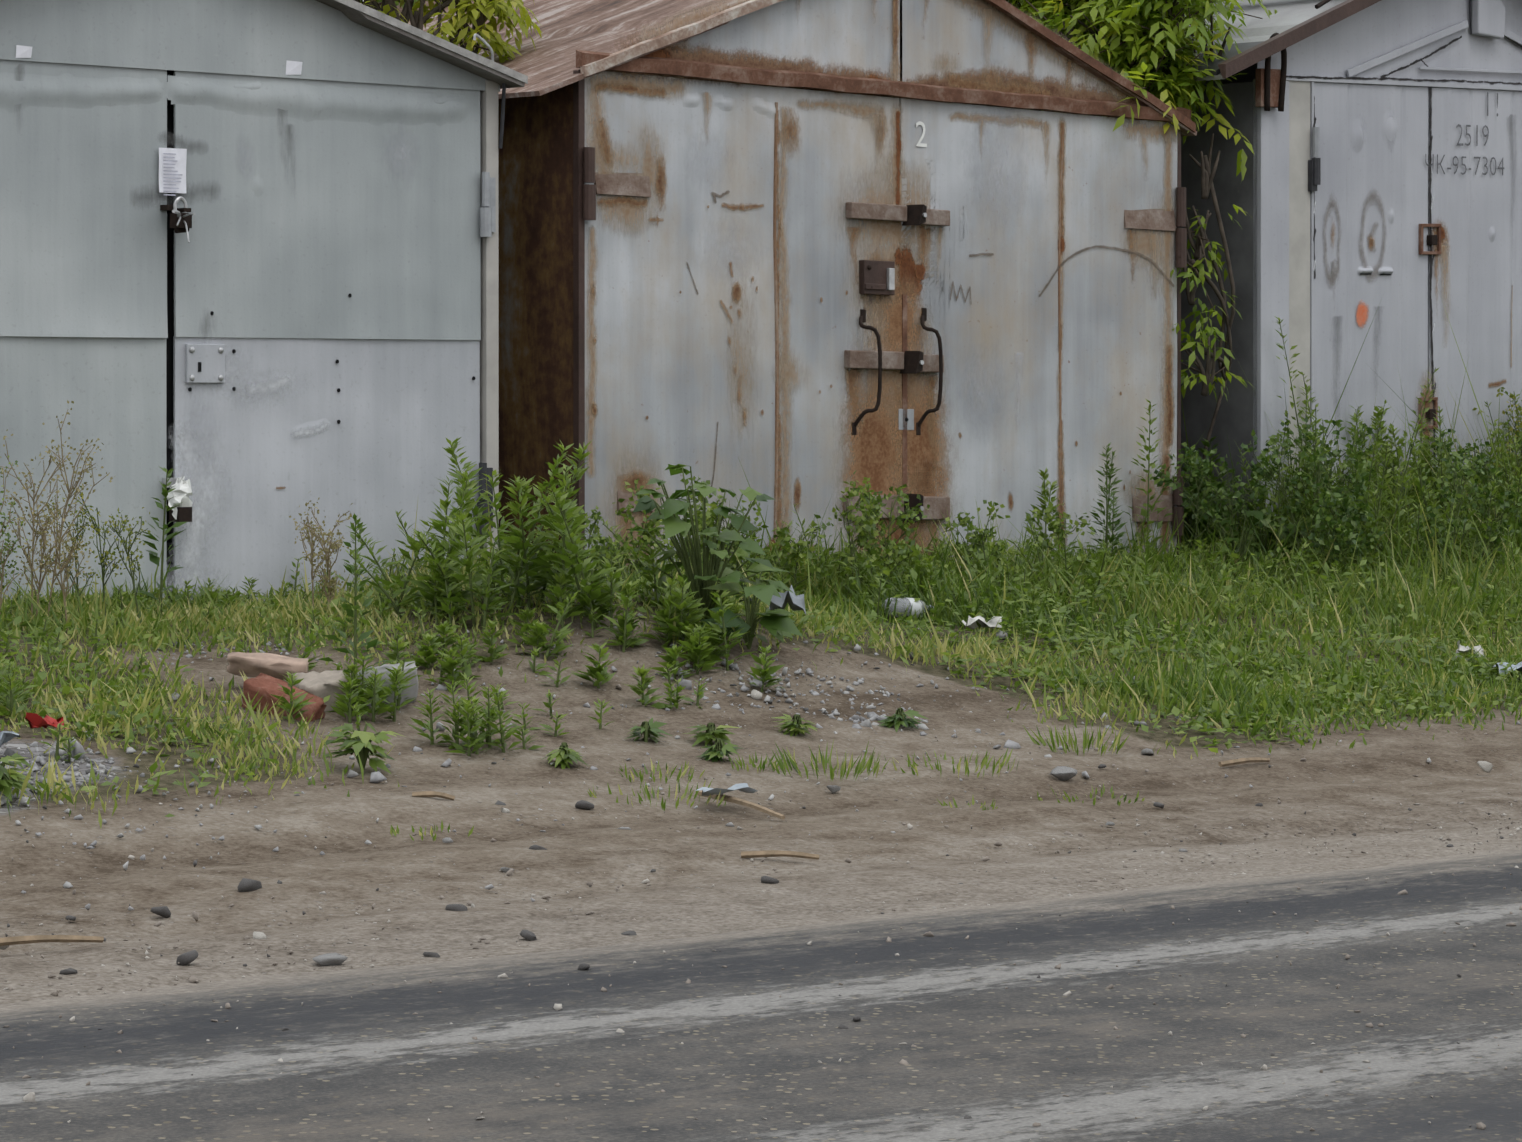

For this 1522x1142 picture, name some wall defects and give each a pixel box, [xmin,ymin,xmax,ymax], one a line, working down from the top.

rust [587,0,1176,567]